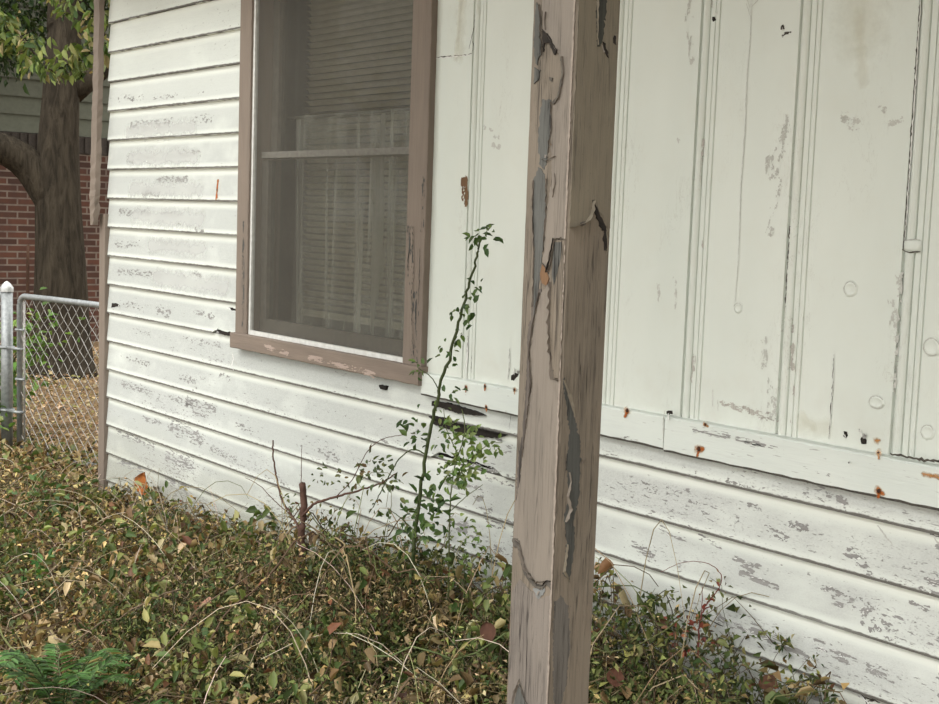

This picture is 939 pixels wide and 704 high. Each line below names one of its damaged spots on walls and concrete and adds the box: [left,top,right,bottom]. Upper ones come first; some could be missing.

peeling [533,3,542,84]
peeling [596,0,607,47]
crack [735,0,758,297]
peeling [765,115,790,237]
peeling [571,200,609,255]
peeling [443,99,586,704]
peeling [631,541,656,560]
peeling [732,556,779,590]
peeling [764,520,809,542]
peeling [842,546,888,581]
peeling [820,585,898,644]
peeling [680,605,894,684]